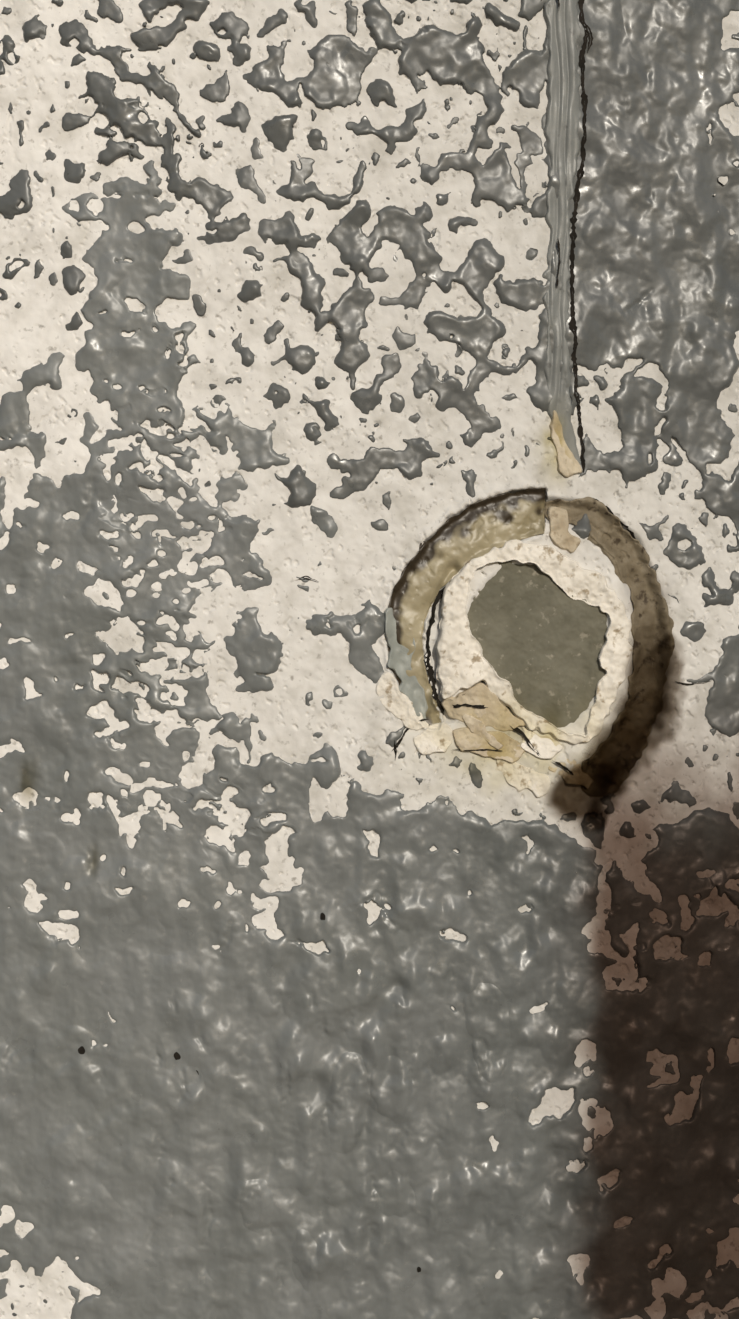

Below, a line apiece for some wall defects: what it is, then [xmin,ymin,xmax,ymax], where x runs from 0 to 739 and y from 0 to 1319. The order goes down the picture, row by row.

peeling [0,0,739,954]
peeling [529,1002,548,1014]
peeling [574,1039,596,1076]
peeling [529,1087,598,1173]
peeling [0,1205,34,1238]
peeling [0,1250,100,1319]
peeling [567,1254,589,1285]